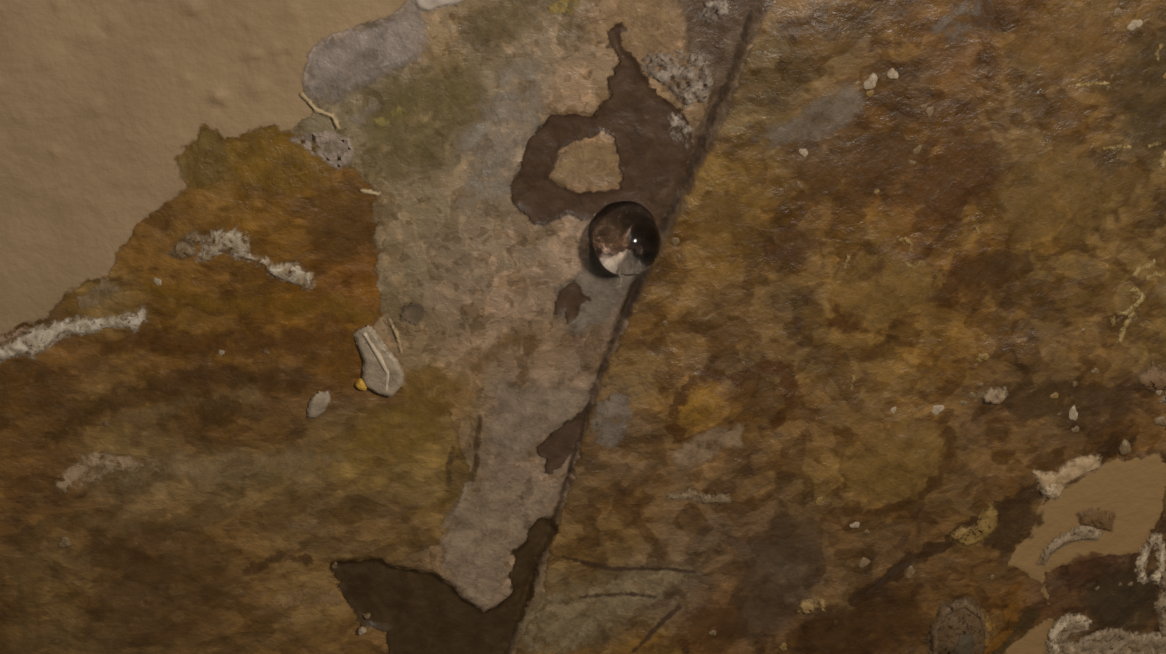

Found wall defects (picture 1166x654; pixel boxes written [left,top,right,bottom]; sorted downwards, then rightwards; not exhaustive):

water stain [0,124,473,654]
peeling [290,0,714,654]
crack [506,550,696,654]
crack [551,0,772,521]
water stain [517,0,1166,654]